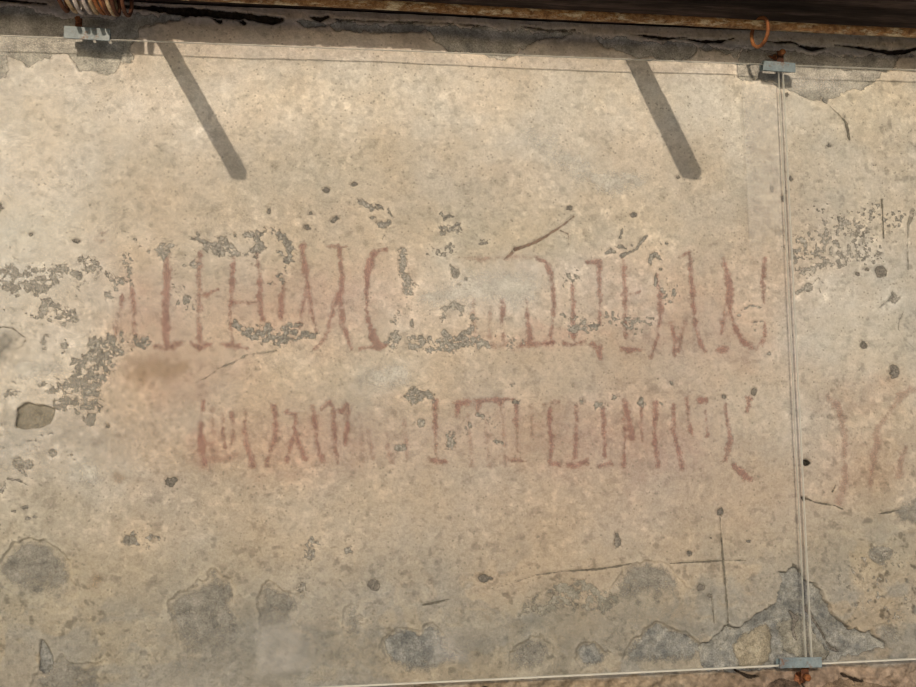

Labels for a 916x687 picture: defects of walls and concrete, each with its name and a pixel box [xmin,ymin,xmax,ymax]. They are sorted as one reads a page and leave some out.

flaking render [0,6,184,78]
flaking render [297,20,580,60]
flaking render [596,36,898,103]
spalling [780,199,906,295]
spalling [0,253,134,326]
spalling [38,330,152,426]
spalling [698,567,885,687]